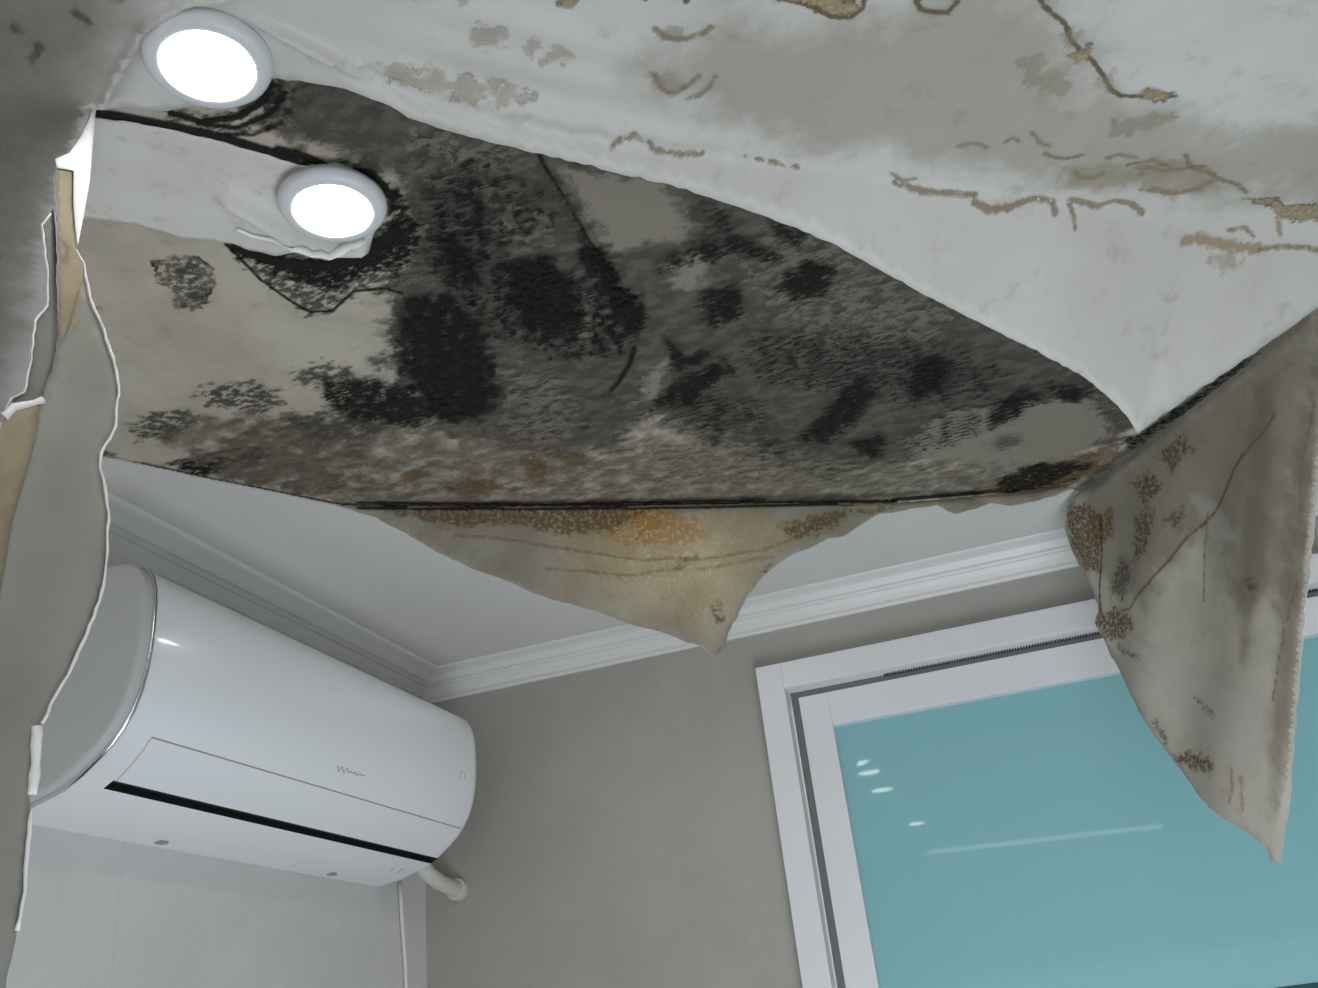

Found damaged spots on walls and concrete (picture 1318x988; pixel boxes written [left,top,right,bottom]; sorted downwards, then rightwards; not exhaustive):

water stain [1038,0,1178,103]
water stain [0,0,1134,576]
water stain [1112,436,1195,601]